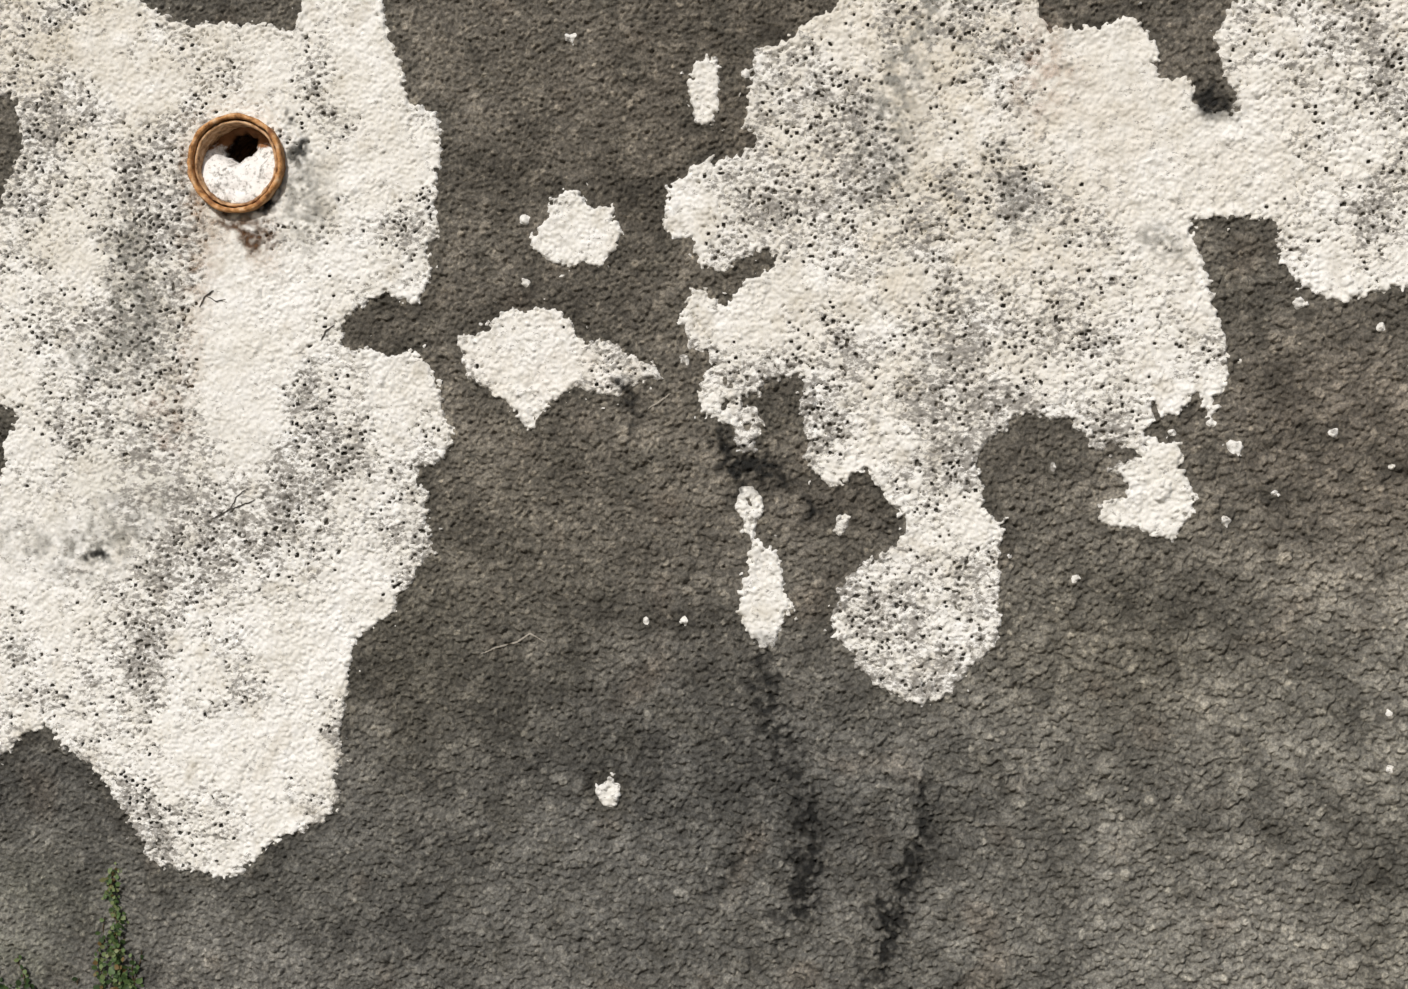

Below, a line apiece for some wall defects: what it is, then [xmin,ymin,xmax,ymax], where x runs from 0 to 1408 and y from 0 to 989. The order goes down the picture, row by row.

peeling [0,0,455,880]
peeling [457,298,664,431]
peeling [520,183,624,277]
peeling [662,0,1408,707]